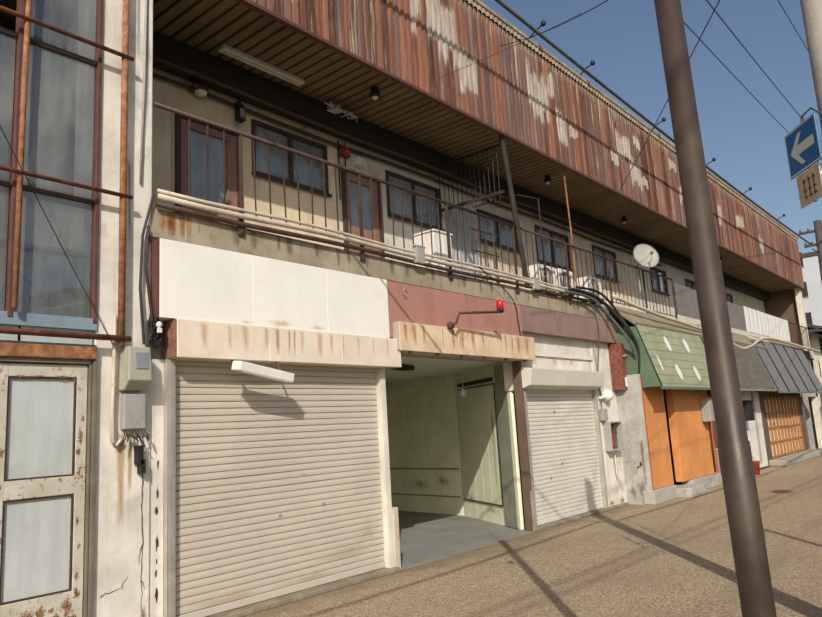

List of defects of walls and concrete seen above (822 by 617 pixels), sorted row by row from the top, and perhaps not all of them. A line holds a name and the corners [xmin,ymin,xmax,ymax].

rust [161,211,200,235]
rust [16,572,80,617]